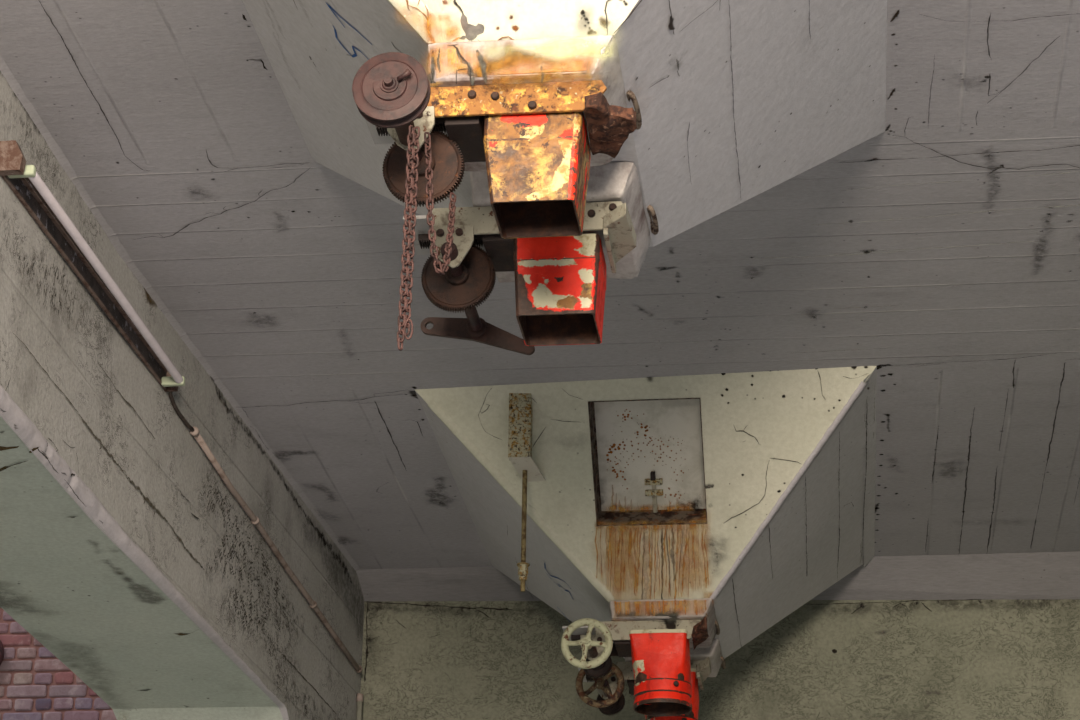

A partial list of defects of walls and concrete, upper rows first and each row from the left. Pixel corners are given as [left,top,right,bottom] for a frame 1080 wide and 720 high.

crack [39,1,147,171]
crack [134,151,311,240]
crack [604,0,642,34]
crack [668,0,741,196]
crack [840,70,1080,173]
crack [920,14,1070,125]
crack [1,333,203,568]
water stain [210,376,352,583]
corrosion [595,409,712,616]
crack [818,353,1072,567]